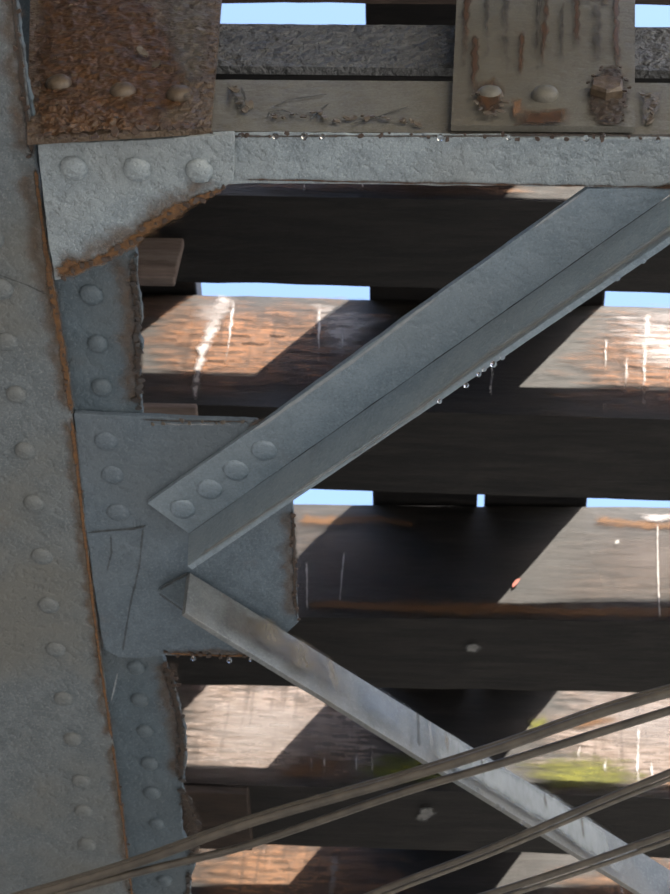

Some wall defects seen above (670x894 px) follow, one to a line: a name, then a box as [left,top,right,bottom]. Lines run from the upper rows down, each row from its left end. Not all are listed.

corrosion [8,0,213,159]
corrosion [235,0,670,142]
damp [154,297,385,397]
damp [558,312,670,409]
corrosion [25,170,226,859]
corrosion [162,650,248,836]